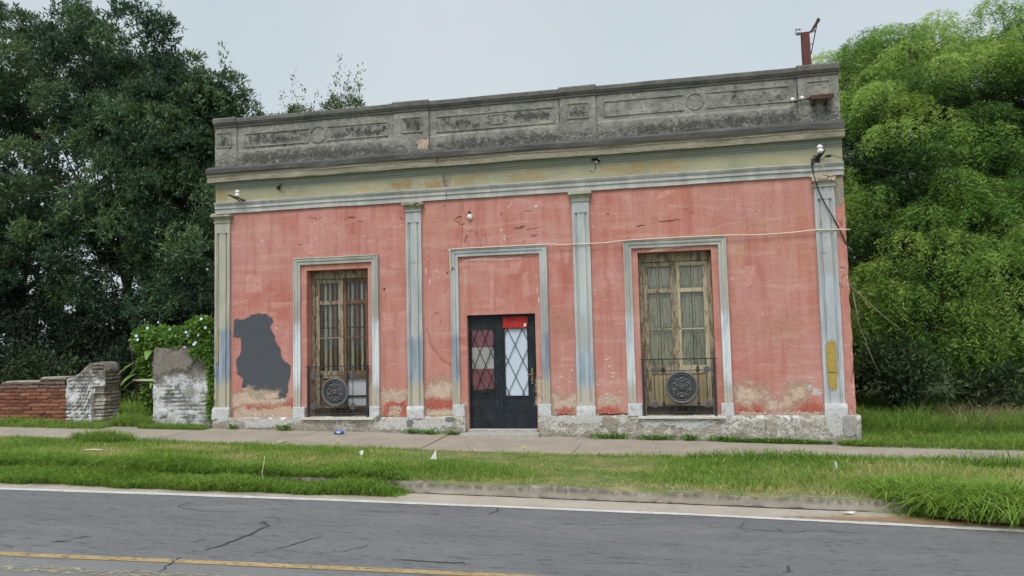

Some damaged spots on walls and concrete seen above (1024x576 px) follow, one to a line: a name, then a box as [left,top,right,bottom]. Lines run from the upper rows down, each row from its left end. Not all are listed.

peeling [217,393,294,429]
peeling [377,388,454,431]
peeling [537,357,717,432]